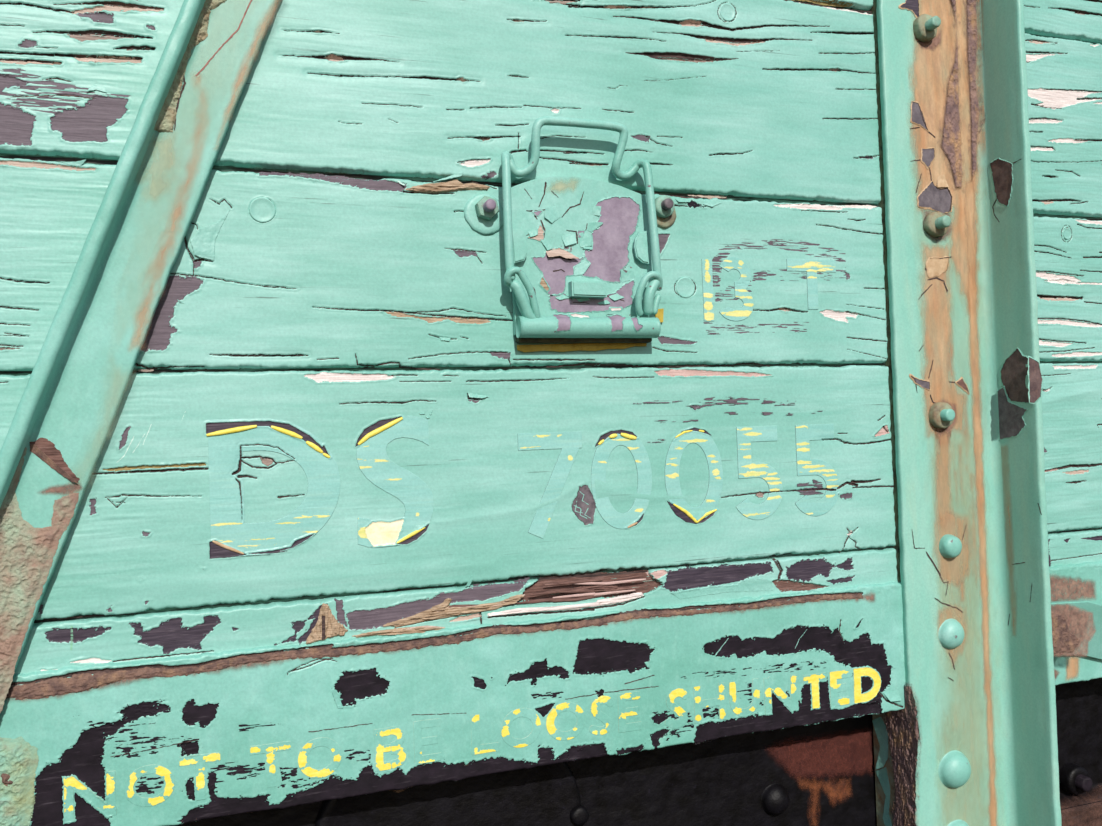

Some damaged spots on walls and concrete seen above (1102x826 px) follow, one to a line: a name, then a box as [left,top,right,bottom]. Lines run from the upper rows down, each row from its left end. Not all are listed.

peeling [0,68,130,146]
crack [282,0,882,248]
crack [1032,138,1102,258]
crack [317,307,513,324]
crack [135,347,770,404]
corrosion [913,0,997,826]
peeling [70,615,238,663]
corrosion [1050,577,1096,679]
peeling [29,699,219,826]
peeling [177,619,903,826]
corrosion [770,731,874,825]
corrosion [885,685,921,826]